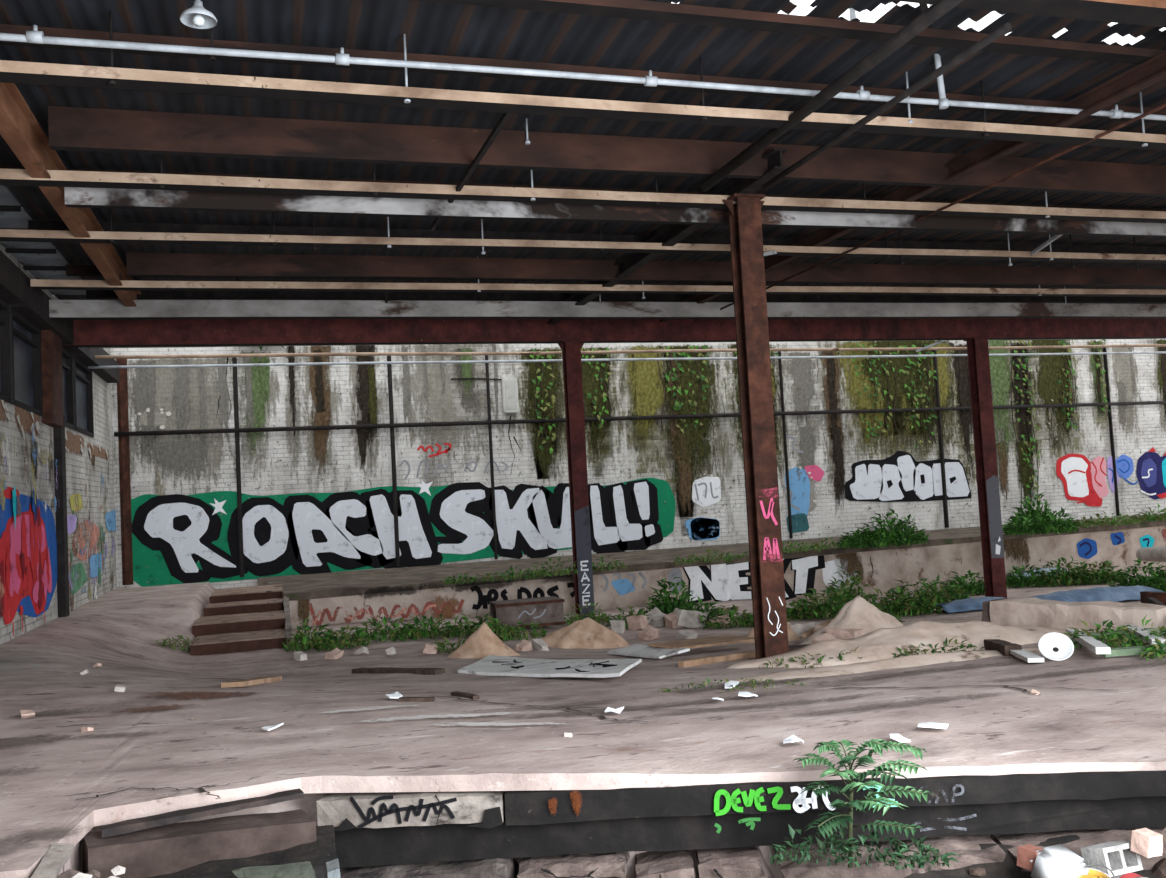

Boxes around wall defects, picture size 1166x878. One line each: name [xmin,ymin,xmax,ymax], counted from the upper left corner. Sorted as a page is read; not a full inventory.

water stain [114,352,270,494]
water stain [284,344,514,487]
water stain [535,394,555,473]
water stain [581,347,615,452]
water stain [667,345,720,516]
water stain [771,340,977,506]
water stain [991,340,1073,500]
water stain [1095,347,1141,440]
water stain [1148,339,1166,431]